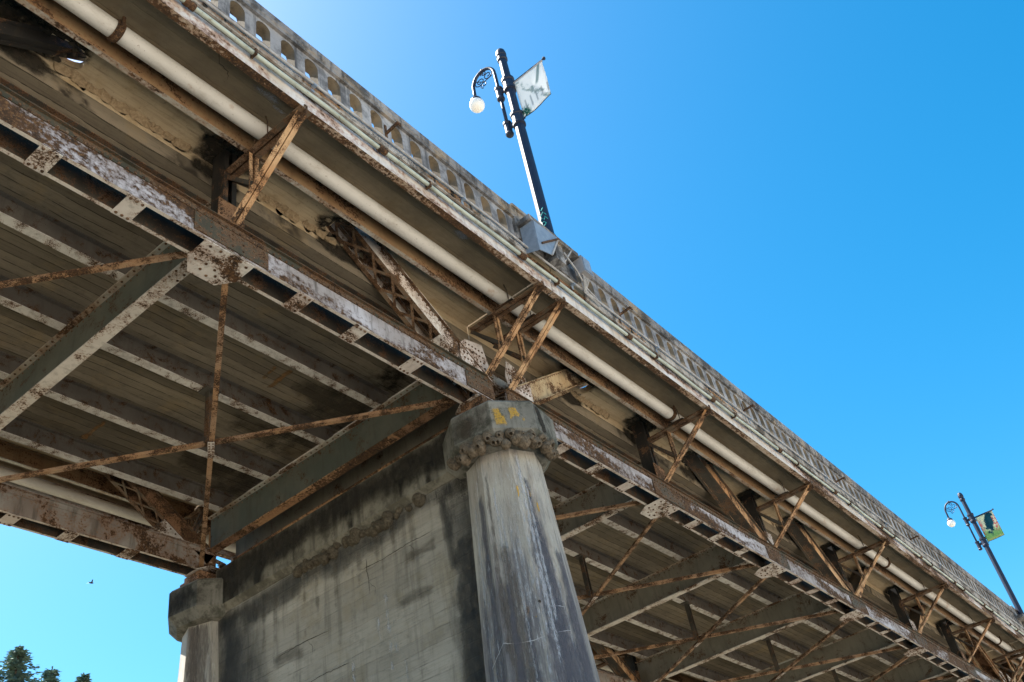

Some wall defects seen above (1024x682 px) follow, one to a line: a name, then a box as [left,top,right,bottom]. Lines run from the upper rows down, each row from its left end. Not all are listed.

leakage [180,409,595,682]